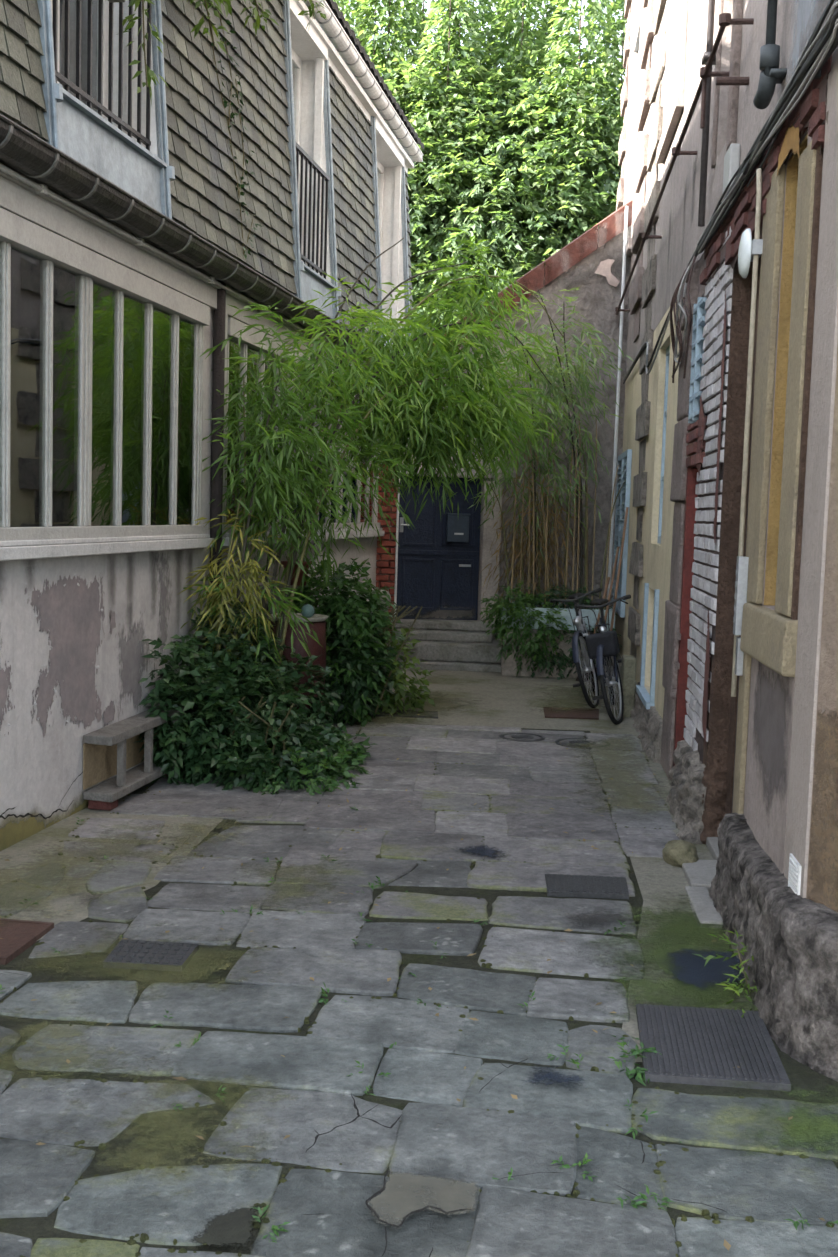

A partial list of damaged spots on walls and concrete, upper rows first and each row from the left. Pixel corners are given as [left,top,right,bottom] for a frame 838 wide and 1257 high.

damp [792,0,835,66]
peeling [24,573,116,737]
peeling [0,661,15,735]
crack [0,773,82,820]
crack [306,1093,402,1152]